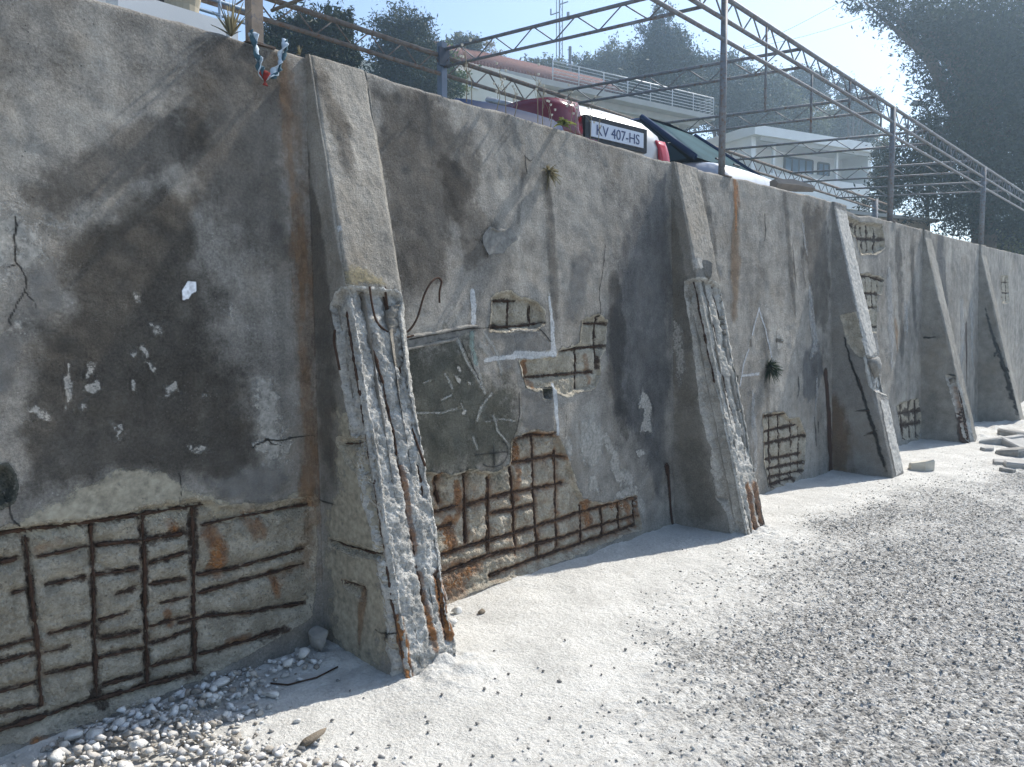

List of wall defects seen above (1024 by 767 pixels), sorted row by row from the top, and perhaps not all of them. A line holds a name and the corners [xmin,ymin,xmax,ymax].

crack [8,216,36,325]
rust [731,179,741,318]
damp [64,363,73,409]
damp [254,377,288,470]
spalling [673,257,806,535]
crack [844,337,887,472]
peeling [835,207,921,475]
crack [985,308,1018,415]
spalling [0,277,645,746]